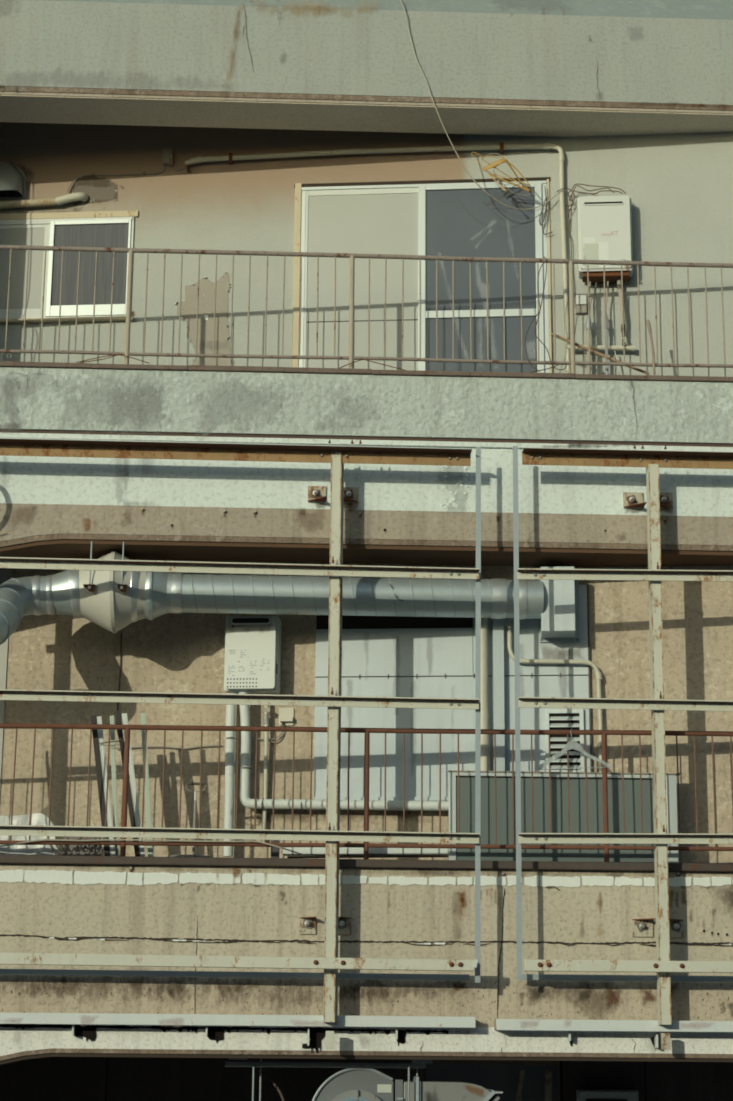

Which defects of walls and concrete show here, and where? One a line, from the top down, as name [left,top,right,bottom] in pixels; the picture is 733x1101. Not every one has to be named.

peeling [174,271,234,366]
crack [0,888,733,1054]